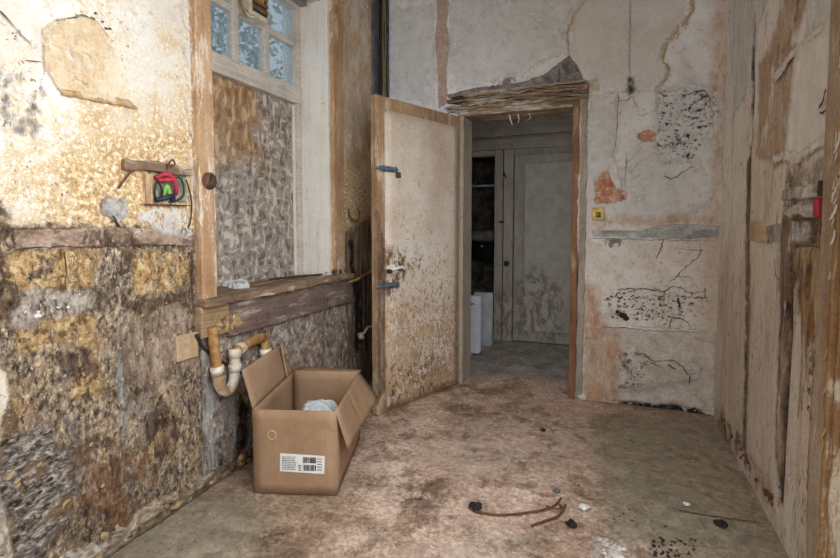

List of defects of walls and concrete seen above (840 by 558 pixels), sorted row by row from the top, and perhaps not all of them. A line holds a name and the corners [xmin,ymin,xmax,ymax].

water stain [2,74,44,137]
peeling [447,56,586,101]
spalling [610,77,716,180]
flaking render [594,156,627,204]
flaking render [0,248,94,331]
flaking render [122,248,196,316]
spalling [604,291,707,328]
water stain [775,201,820,504]
flaking render [0,370,9,424]
peeling [0,427,82,558]